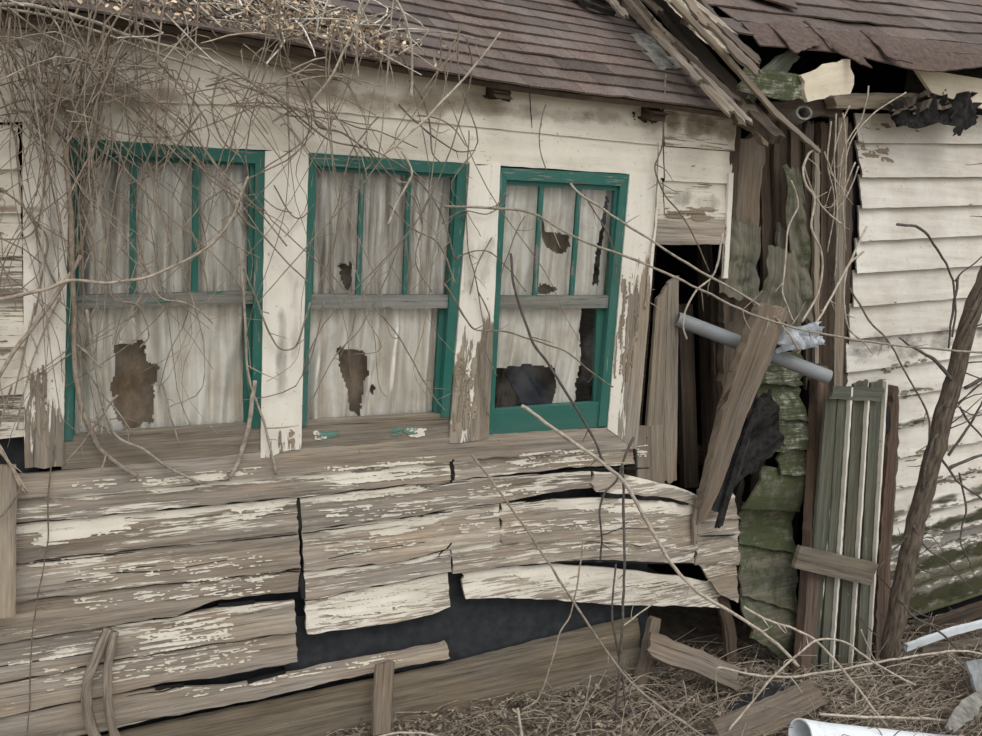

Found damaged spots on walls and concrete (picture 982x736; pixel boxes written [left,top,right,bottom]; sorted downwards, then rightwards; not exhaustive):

peeling [664,207,717,221]
peeling [613,275,641,383]
peeling [453,356,477,431]
peeling [72,479,117,489]
peeling [130,467,261,493]
peeling [31,516,144,547]
crack [483,467,693,570]
peeling [26,552,279,602]
peeling [74,596,122,610]
peeling [8,614,267,691]